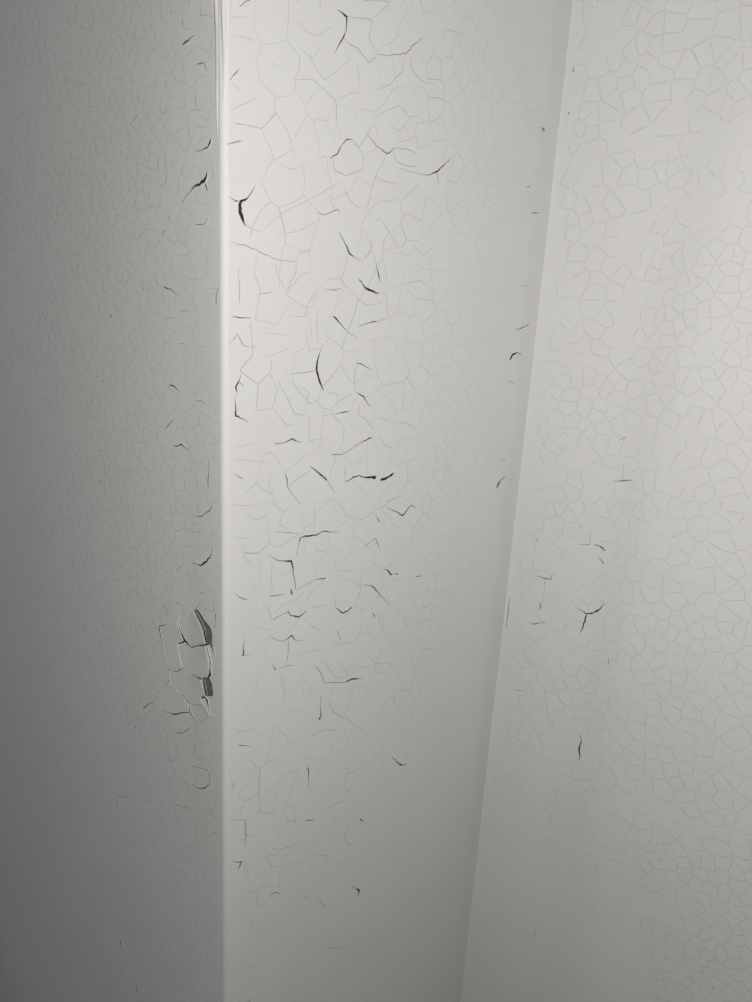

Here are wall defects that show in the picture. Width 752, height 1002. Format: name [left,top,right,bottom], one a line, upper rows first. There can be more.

peeling [156,610,215,723]
crack [161,0,752,1002]